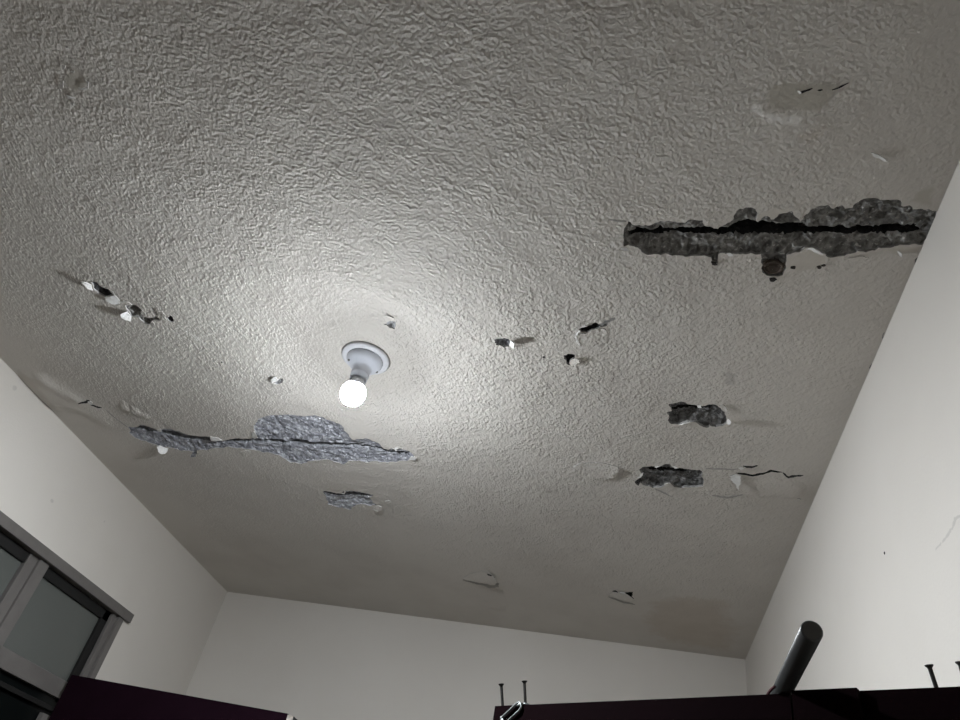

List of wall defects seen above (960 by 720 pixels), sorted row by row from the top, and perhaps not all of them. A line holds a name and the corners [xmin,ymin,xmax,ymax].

spalling [604,183,944,282]
flaking render [81,281,215,350]
flaking render [495,338,515,349]
flaking render [564,354,580,366]
spalling [667,402,731,428]
spalling [128,414,416,464]
spalling [635,464,704,497]
crack [706,465,804,499]
spalling [323,490,391,512]